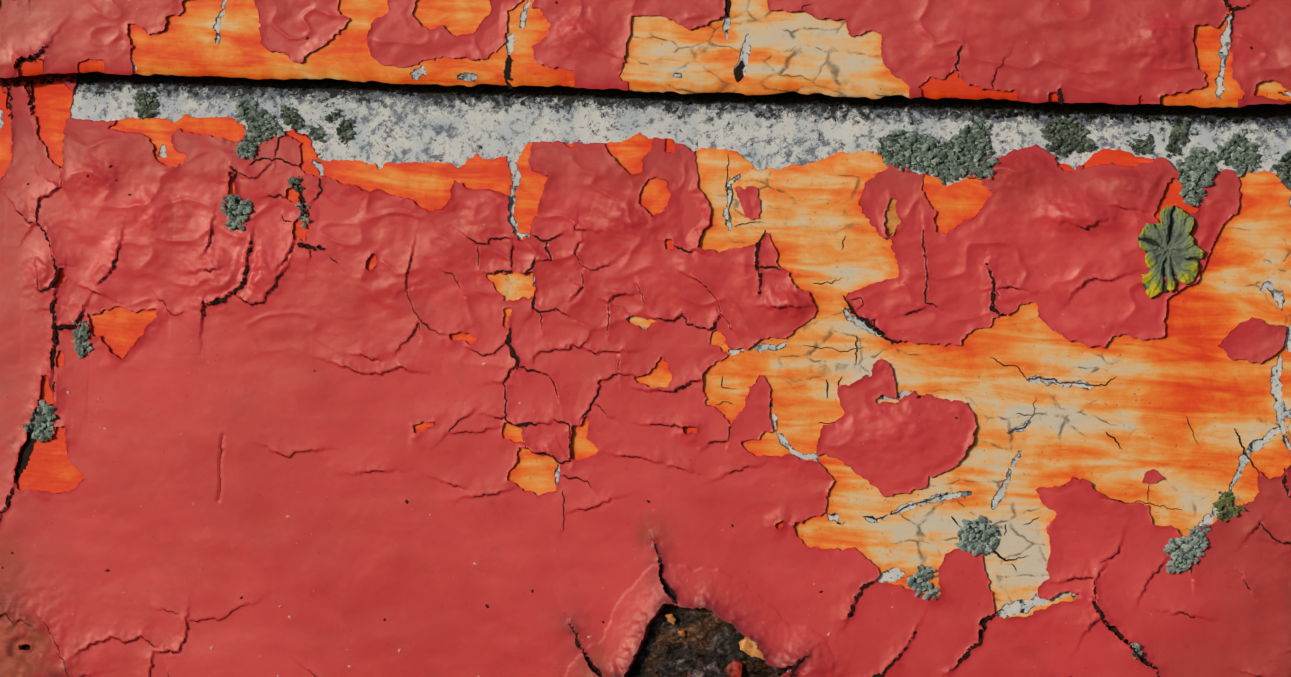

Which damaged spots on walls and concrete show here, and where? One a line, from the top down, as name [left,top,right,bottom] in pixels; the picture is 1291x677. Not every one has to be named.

peeling [0,55,105,179]
peeling [108,114,246,167]
peeling [128,0,575,87]
peeling [619,0,1017,101]
peeling [1160,9,1291,108]
crack [0,182,119,519]
crack [158,137,337,320]
crack [443,225,750,529]
crack [725,157,937,424]
peeling [695,148,1291,619]
crack [950,612,996,671]
crack [1066,546,1160,677]